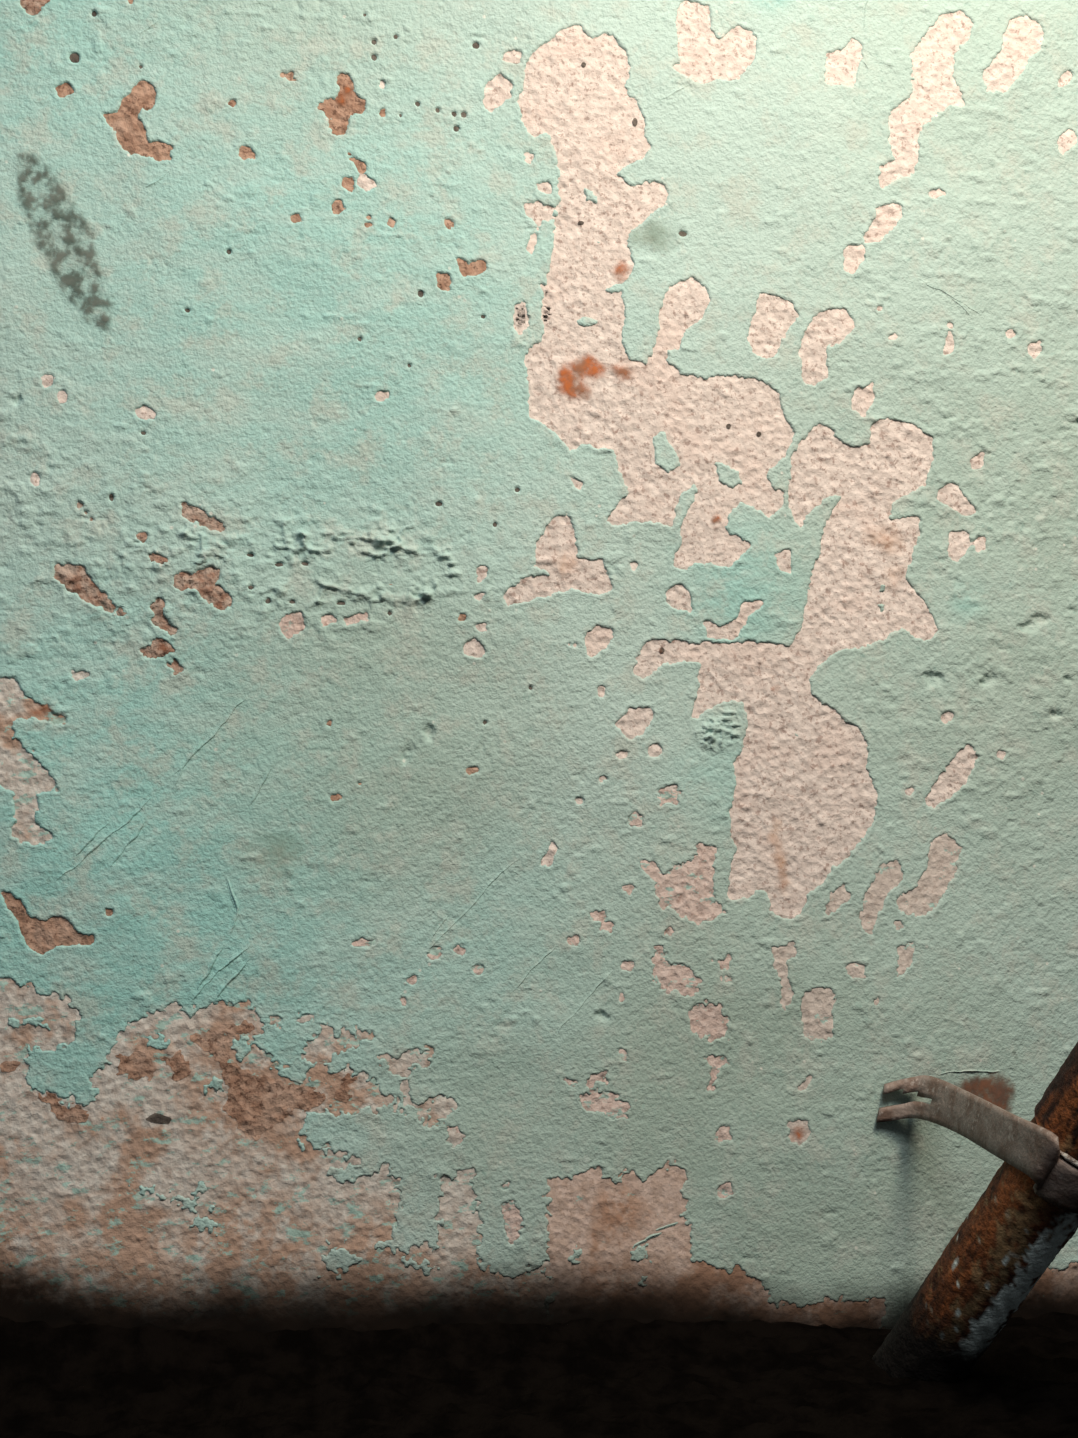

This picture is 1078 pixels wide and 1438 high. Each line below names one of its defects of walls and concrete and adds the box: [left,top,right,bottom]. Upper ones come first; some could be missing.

peeling [103,65,173,161]
peeling [317,73,402,135]
spalling [415,102,466,132]
peeling [332,152,377,214]
mould [18,154,110,328]
peeling [418,258,487,297]
rust [559,356,630,397]
peeling [483,0,986,1091]
peeling [0,677,66,845]
peeling [1,891,94,955]
rust [962,1077,1014,1110]
peeling [0,975,886,1312]